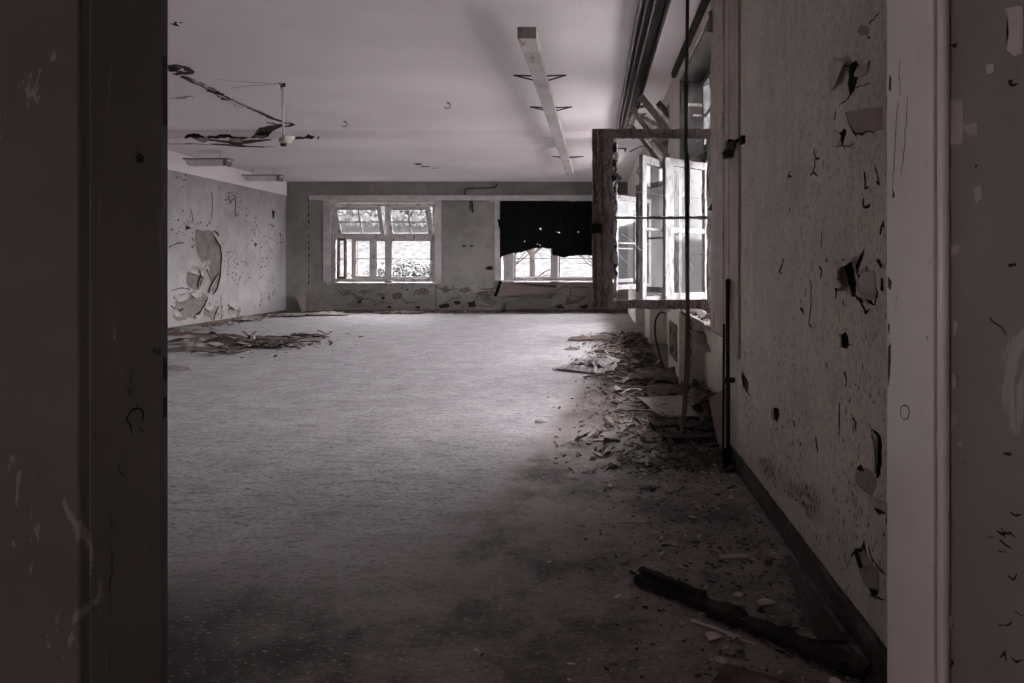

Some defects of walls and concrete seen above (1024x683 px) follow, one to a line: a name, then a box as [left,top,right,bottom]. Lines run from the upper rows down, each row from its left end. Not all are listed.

peeling [1005,5,1023,56]
peeling [184,122,295,148]
crack [787,150,820,180]
peeling [830,59,883,148]
peeling [171,187,284,321]
peeling [337,270,600,310]
spalling [831,250,892,314]
spalling [839,329,853,349]
peeling [869,323,891,404]
peeling [768,407,807,494]
spalling [808,423,887,601]